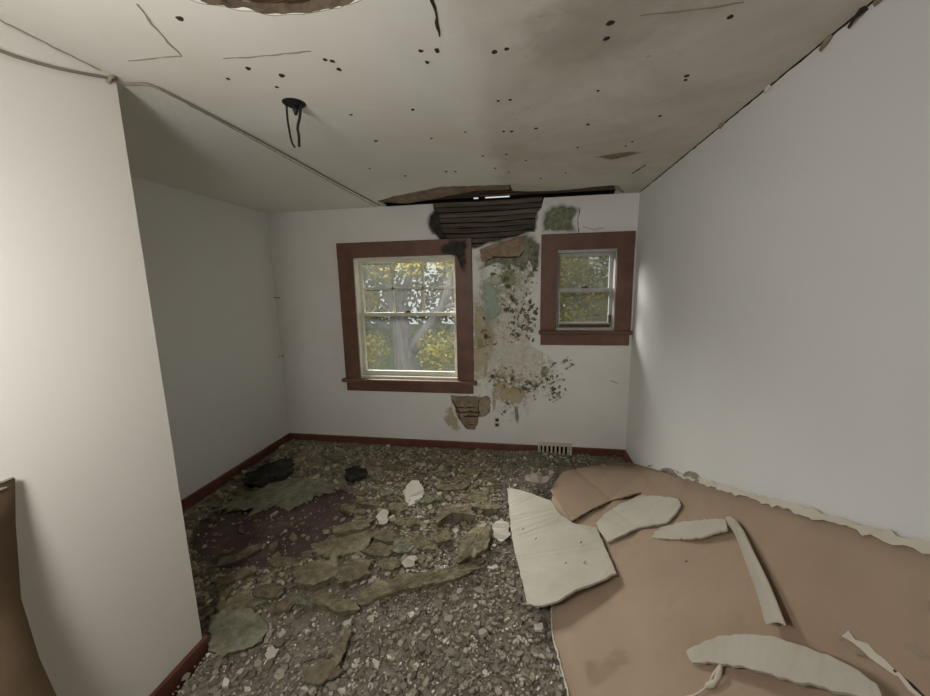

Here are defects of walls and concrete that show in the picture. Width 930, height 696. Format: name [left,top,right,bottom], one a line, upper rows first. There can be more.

flaking render [191,0,361,16]
crack [430,0,440,37]
damp [543,206,580,233]
peeling [417,197,574,430]